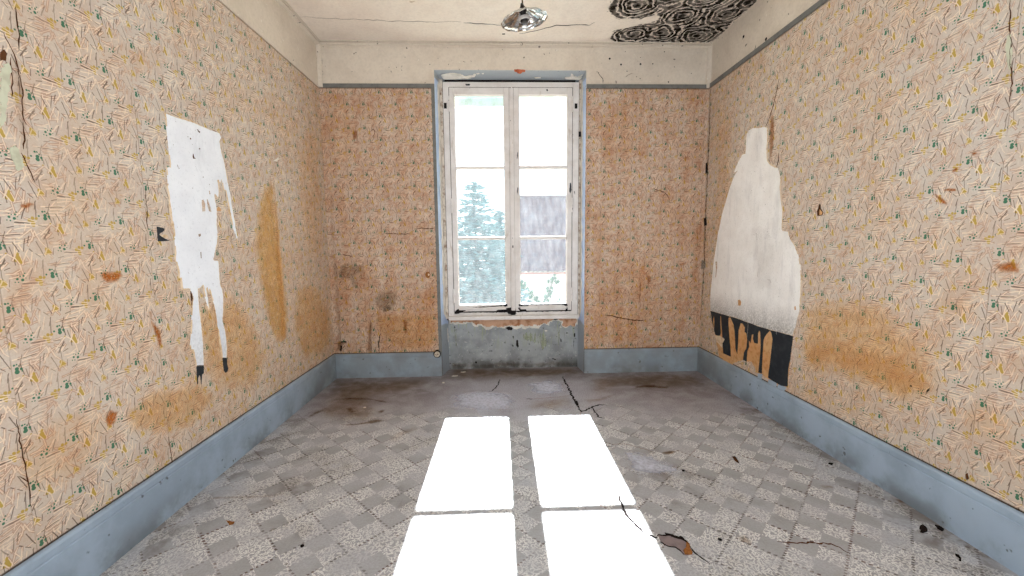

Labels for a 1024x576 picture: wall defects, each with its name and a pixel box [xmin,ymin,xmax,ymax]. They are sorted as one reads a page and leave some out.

crack [1005,0,1013,102]
flaking render [425,73,583,348]
peeling [715,336,733,365]
crack [529,377,655,453]
crack [16,419,32,507]